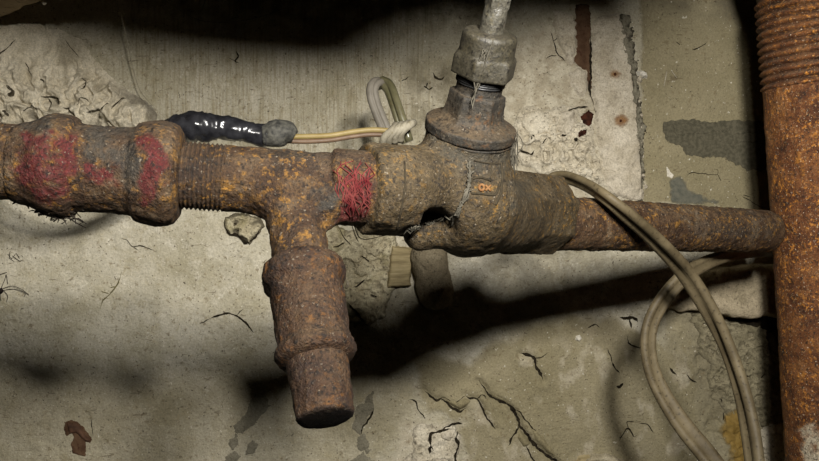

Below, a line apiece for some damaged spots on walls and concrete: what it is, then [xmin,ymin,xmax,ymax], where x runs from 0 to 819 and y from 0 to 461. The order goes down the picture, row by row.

damp [663,119,767,171]
crack [200,310,253,332]
crack [620,316,640,348]
crack [522,353,547,381]
peeling [350,391,374,461]
crack [410,382,558,461]